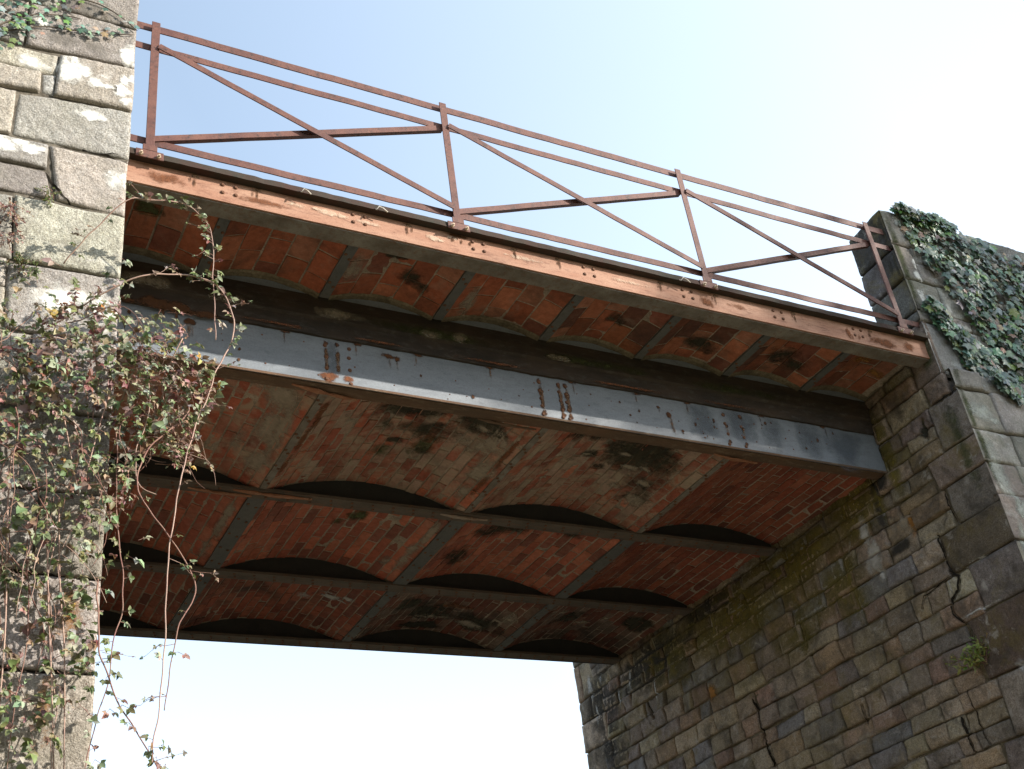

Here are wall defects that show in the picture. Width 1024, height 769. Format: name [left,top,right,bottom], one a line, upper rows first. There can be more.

water stain [377,404,509,497]
corrosion [557,381,576,419]
water stain [568,433,683,505]
corrosion [656,401,748,446]
crack [921,493,975,643]
crack [752,699,776,766]